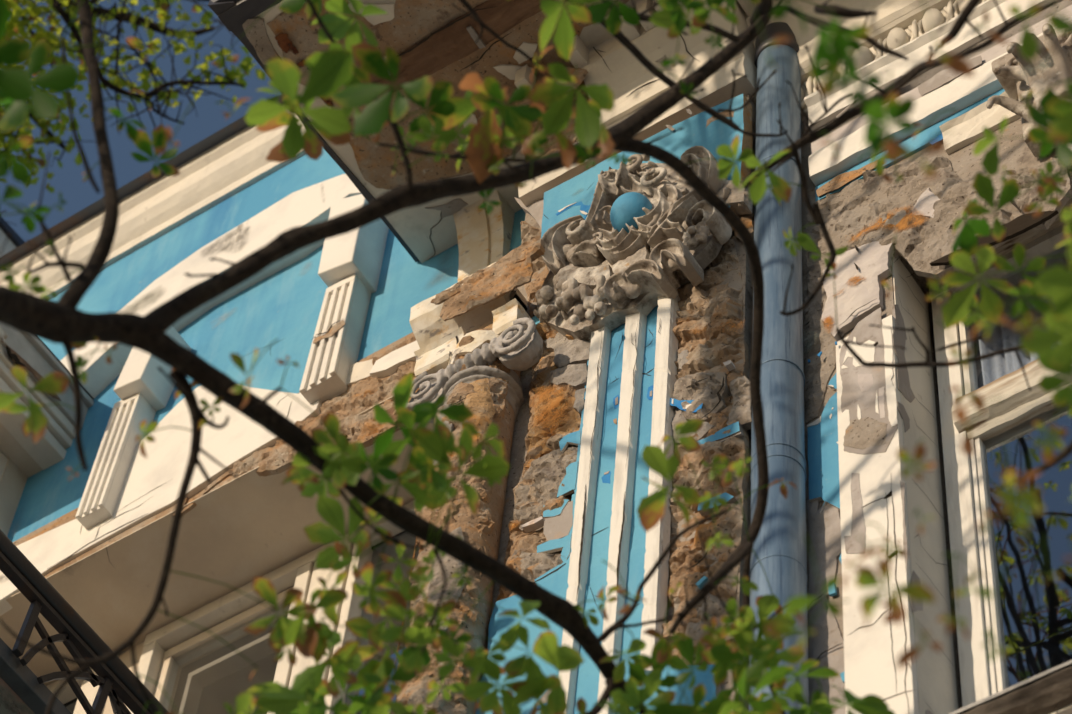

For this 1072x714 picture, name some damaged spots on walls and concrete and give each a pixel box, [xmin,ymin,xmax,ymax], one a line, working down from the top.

spalling [267,0,593,190]
spalling [497,585,515,601]
spalling [427,197,591,583]
crack [535,318,661,601]
spalling [662,211,754,665]
spalling [802,156,1072,714]